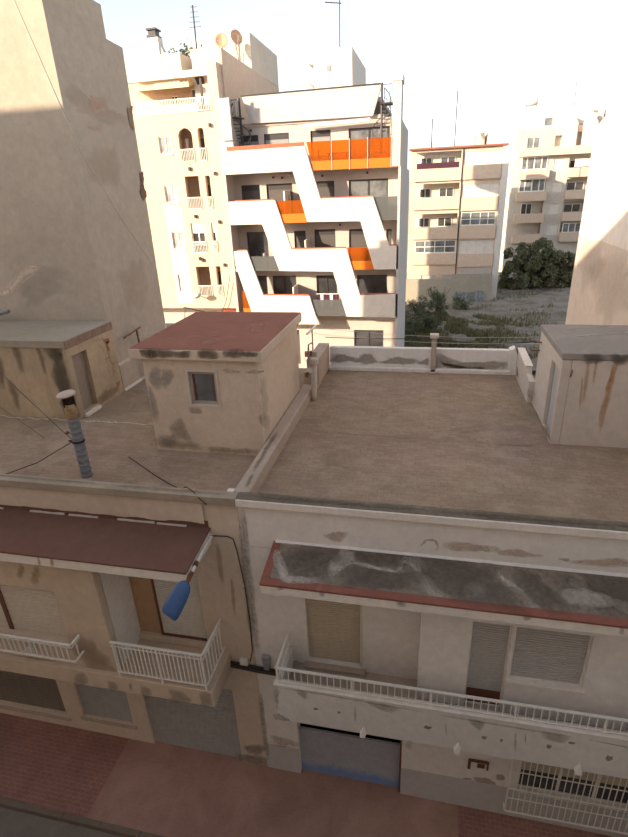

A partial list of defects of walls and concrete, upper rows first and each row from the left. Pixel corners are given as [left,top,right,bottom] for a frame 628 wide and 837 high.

water stain [39,348,70,391]
crack [94,338,120,386]
water stain [140,349,189,358]
corrosion [601,367,616,421]